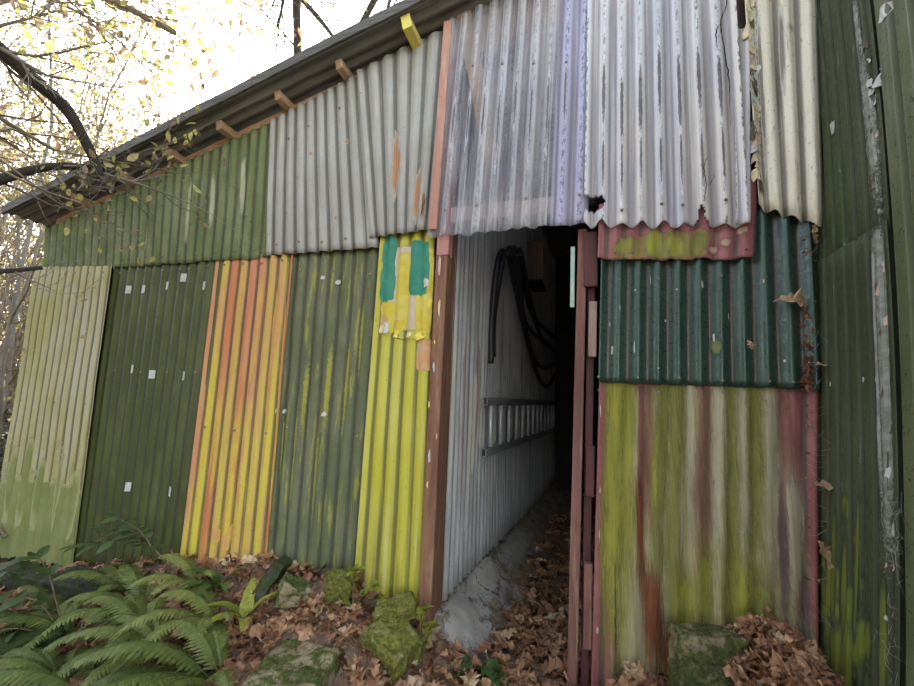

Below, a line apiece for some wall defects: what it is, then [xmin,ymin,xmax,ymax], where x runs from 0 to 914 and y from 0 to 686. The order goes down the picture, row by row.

crack [715,0,731,125]
peeling [851,0,895,621]
corrosion [636,480,671,678]